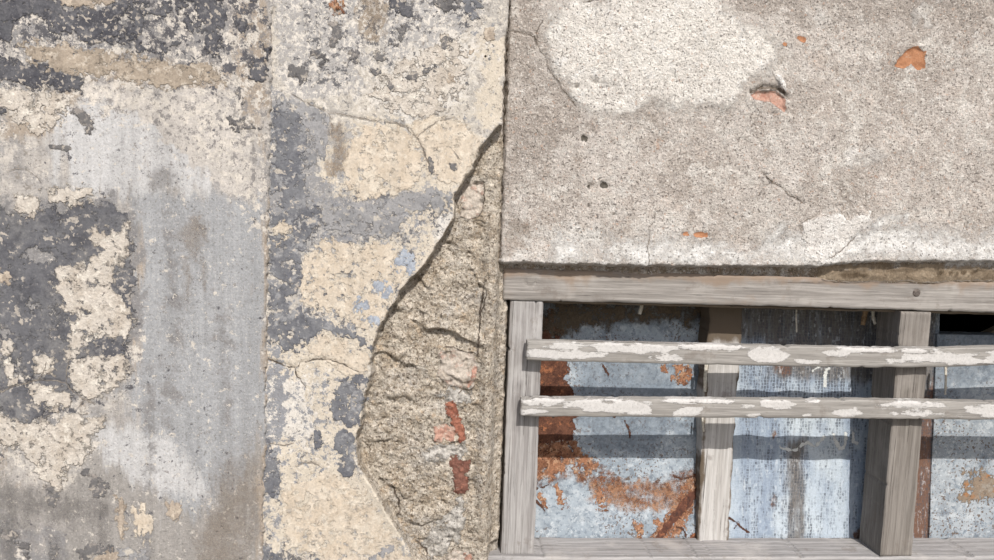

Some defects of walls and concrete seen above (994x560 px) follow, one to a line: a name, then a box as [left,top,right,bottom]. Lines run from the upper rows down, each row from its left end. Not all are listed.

spalling [895,46,927,70]
spalling [750,74,787,112]
spalling [0,0,509,560]
rust [540,361,574,396]
rust [660,363,696,389]
rust [537,416,696,538]
rust [957,467,994,505]